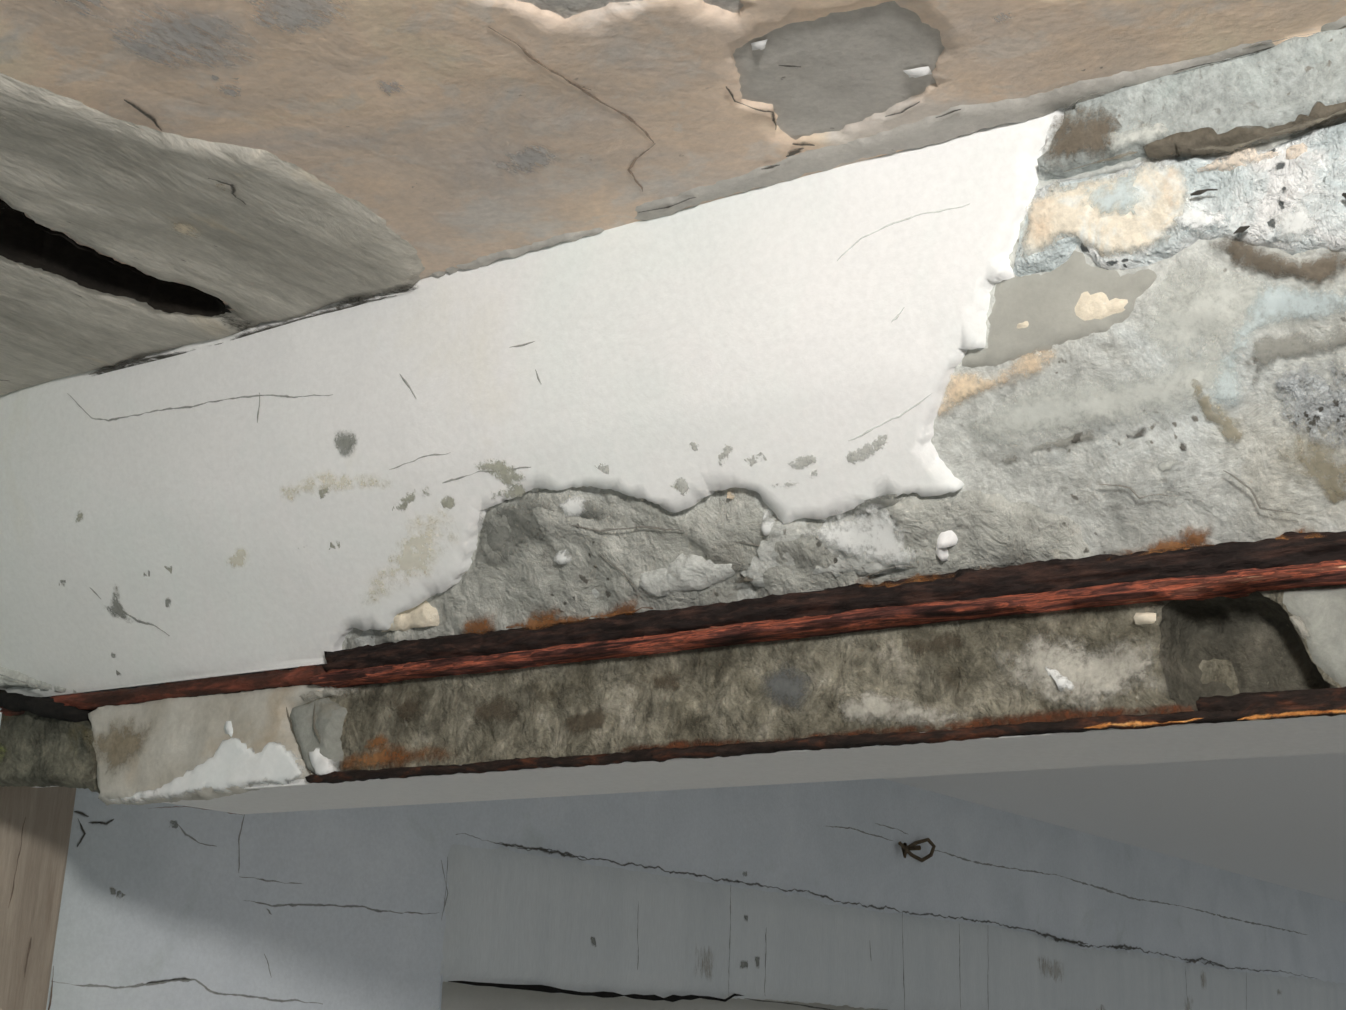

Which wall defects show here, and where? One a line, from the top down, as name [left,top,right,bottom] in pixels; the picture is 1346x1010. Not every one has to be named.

crack [488,27,655,192]
spalling [342,0,1346,650]
rust [1105,528,1214,561]
rust [464,600,653,634]
spalling [1134,591,1338,712]
spalling [0,685,353,805]
leakage [566,710,604,732]
rust [811,705,1202,737]
rust [1237,710,1346,720]
crack [74,811,114,847]
crack [157,806,1316,1010]
crack [51,954,321,1004]